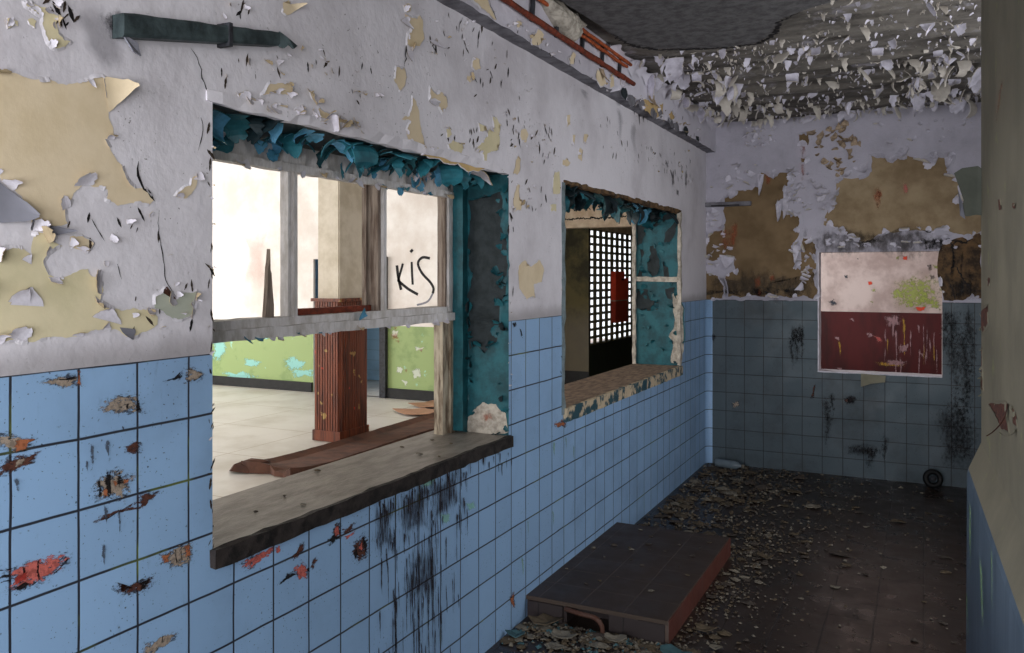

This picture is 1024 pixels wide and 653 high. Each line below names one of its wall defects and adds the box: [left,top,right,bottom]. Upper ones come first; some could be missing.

peeling [0,69,260,378]
spalling [173,0,1018,436]
leakage [885,280,975,461]
leakage [376,468,471,653]